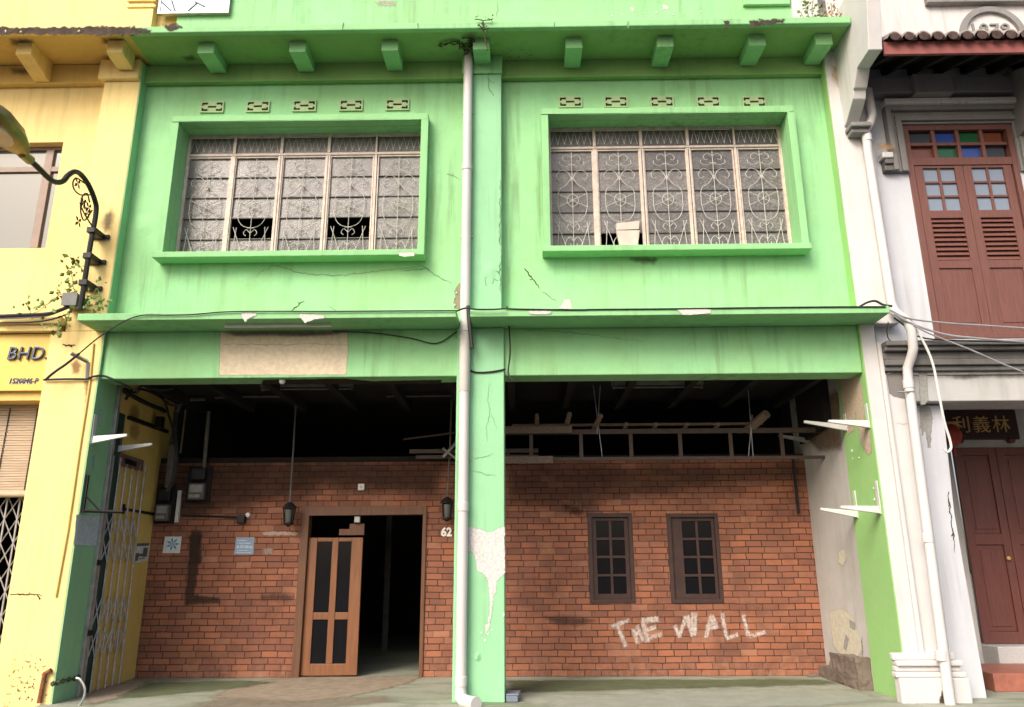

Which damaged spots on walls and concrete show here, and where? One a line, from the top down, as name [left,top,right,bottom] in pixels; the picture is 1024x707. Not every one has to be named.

crack [258,265,451,283]
crack [485,181,557,302]
crack [471,385,497,476]
peeling [840,375,872,460]
crack [947,492,955,551]
peeling [468,526,505,641]
flaking render [829,608,862,656]